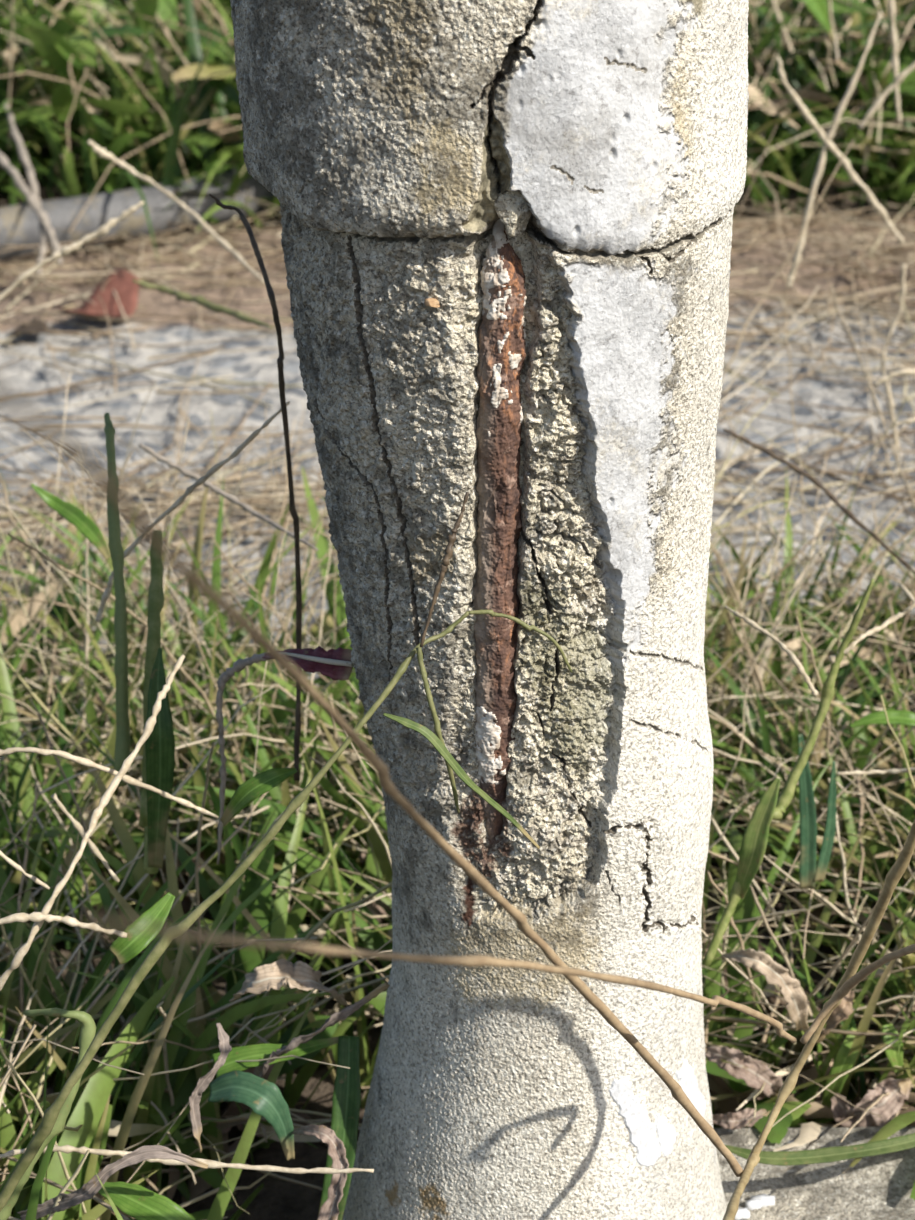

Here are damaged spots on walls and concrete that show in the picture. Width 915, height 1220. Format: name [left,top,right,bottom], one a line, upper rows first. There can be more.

corrosion [446,773,523,927]
crack [298,0,730,686]
spalling [424,0,701,917]
crack [521,528,709,935]